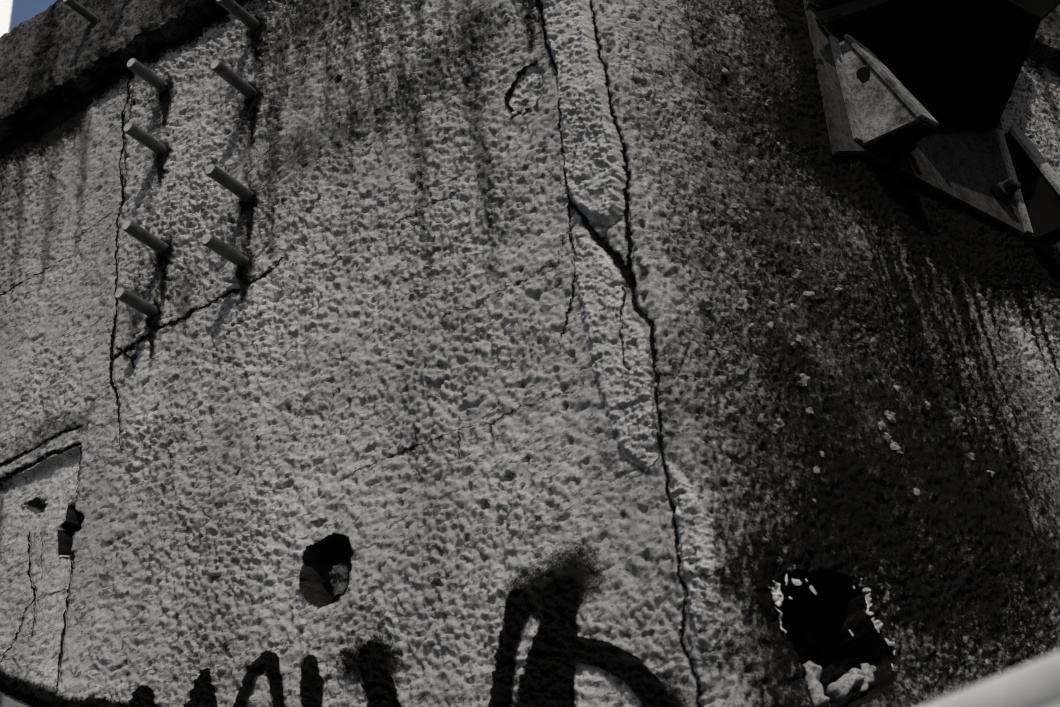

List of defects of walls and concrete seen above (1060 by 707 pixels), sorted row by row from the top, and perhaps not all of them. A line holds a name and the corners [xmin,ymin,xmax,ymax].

damp [521,0,555,66]
damp [0,0,495,285]
crack [0,74,285,450]
crack [441,0,727,707]
damp [638,0,1060,707]
spalling [21,495,48,513]
crack [0,532,75,691]
crack [0,424,88,498]
damp [0,667,131,707]
spalling [54,504,84,558]
spalling [299,533,353,606]
spalling [765,565,898,707]